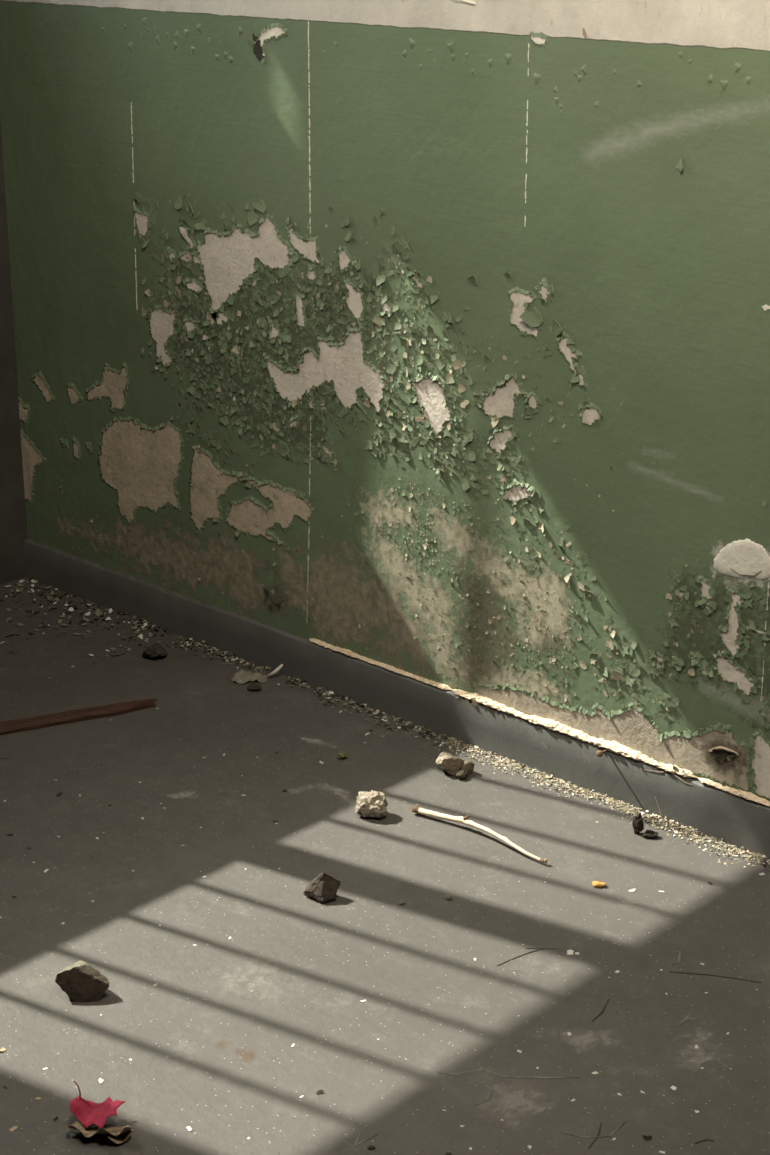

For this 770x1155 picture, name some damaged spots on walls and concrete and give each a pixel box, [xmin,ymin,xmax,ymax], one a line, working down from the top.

peeling [247,23,288,65]
peeling [32,194,770,807]